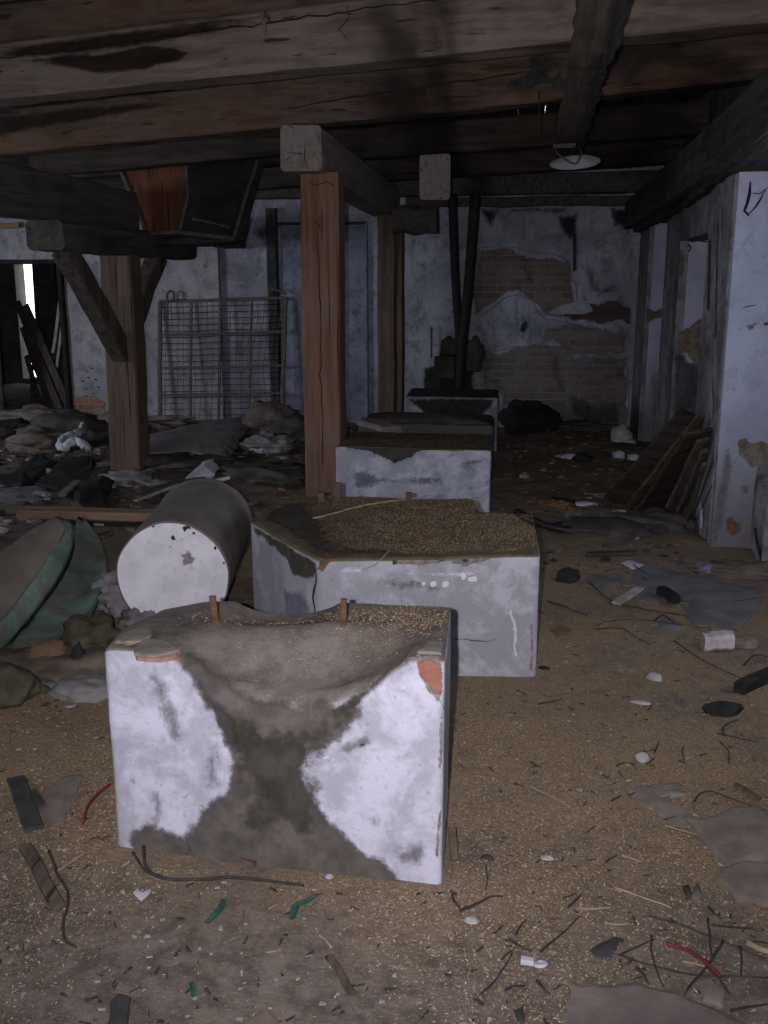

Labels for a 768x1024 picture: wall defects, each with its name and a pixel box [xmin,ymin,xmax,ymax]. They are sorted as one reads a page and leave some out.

damp [5,20,236,73]
crack [0,0,426,59]
crack [743,181,767,217]
crack [314,215,324,465]
flaking render [424,246,631,426]
flaking render [699,440,768,535]
spalling [116,628,182,662]
spalling [416,641,444,702]
damp [130,653,398,881]
damp [400,847,421,861]